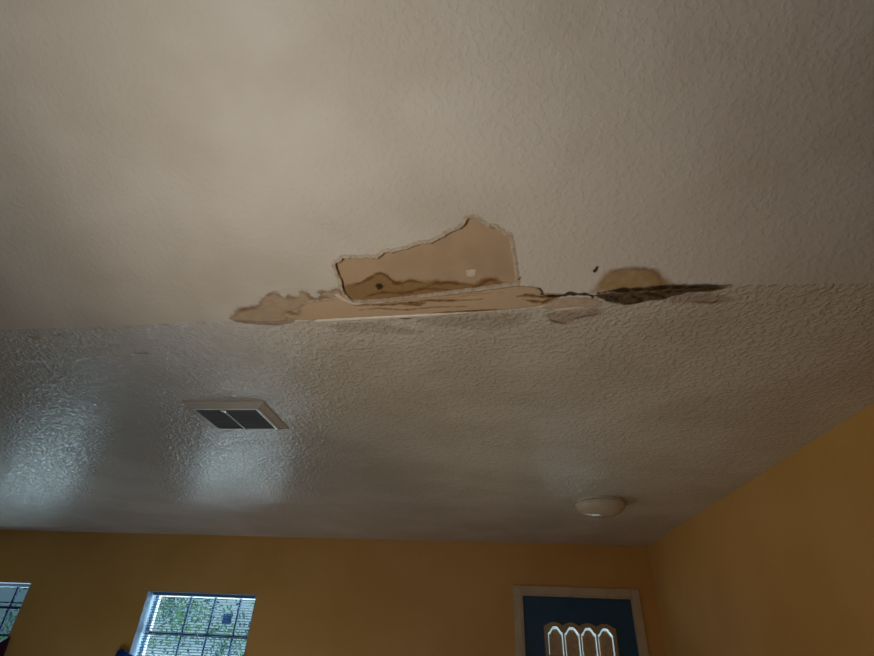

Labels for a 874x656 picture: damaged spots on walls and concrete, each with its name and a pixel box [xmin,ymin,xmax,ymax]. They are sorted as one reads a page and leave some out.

flaking render [284,214,600,323]